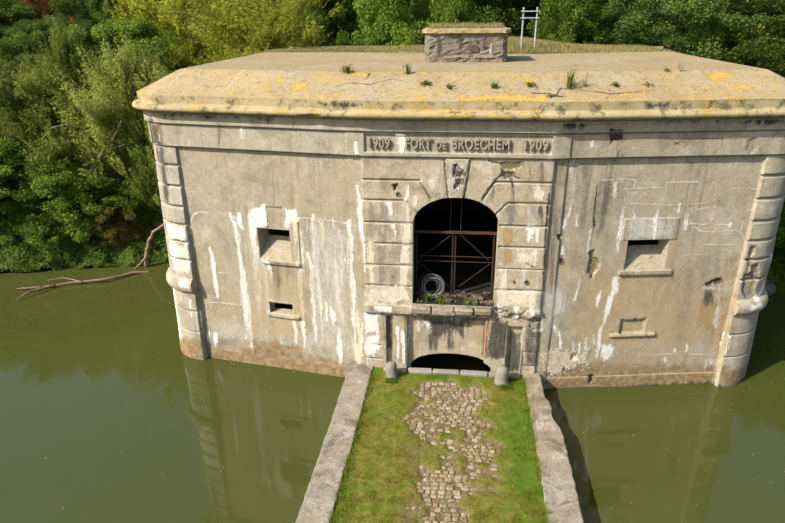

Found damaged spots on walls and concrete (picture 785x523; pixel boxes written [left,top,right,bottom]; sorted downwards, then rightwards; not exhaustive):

leakage [396,132,405,154]
leakage [420,137,468,196]
spalling [453,163,467,189]
crack [482,169,520,198]
leakage [166,222,219,346]
leakage [229,184,375,364]
leakage [376,185,418,289]
spalling [586,250,599,279]
leakage [486,173,731,371]
leakage [371,303,479,364]
peeling [537,347,595,384]